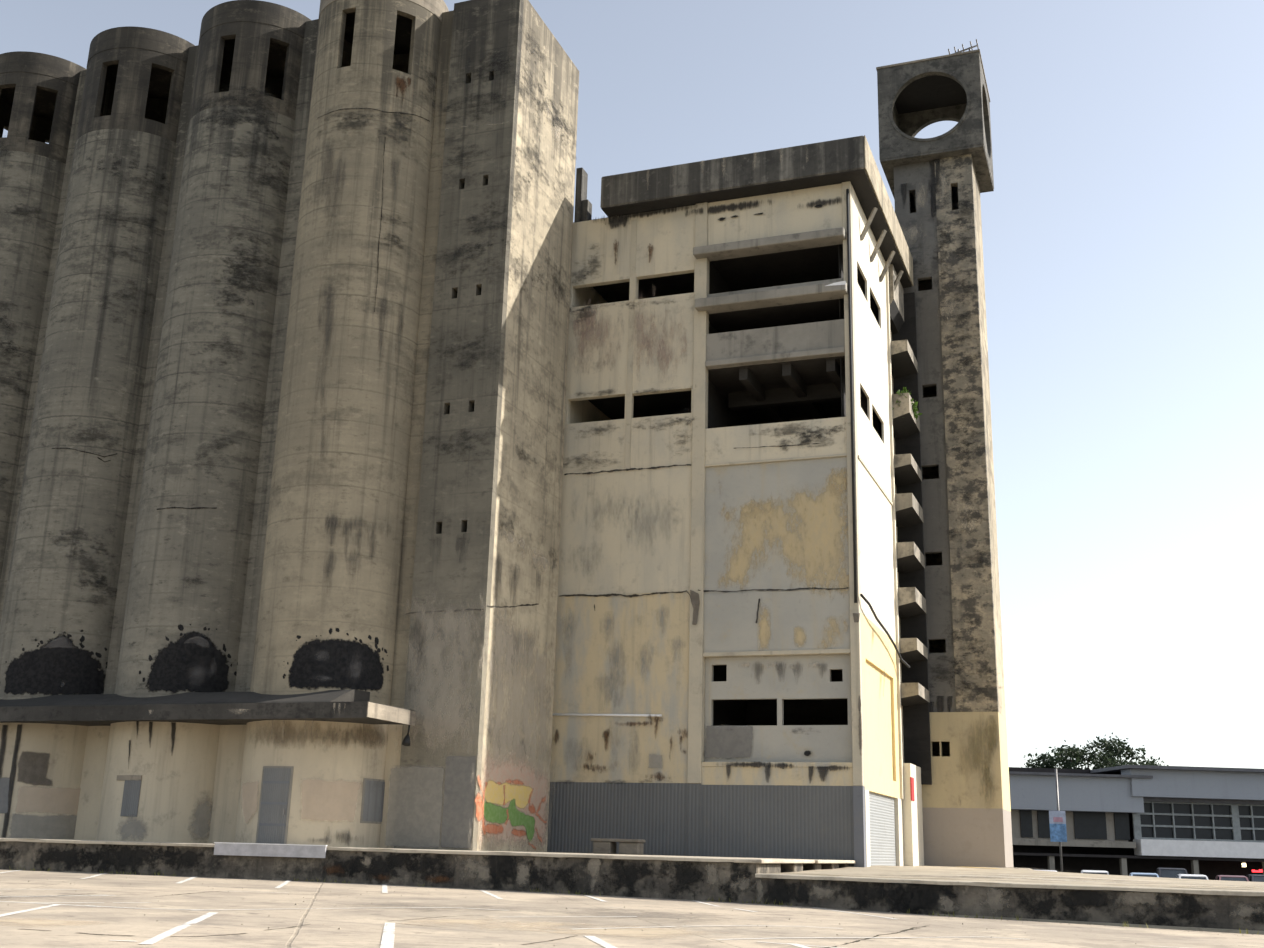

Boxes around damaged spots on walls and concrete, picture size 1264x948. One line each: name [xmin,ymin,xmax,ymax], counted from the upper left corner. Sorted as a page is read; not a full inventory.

peeling [722,472,849,591]
peeling [822,613,860,647]
water stain [0,724,22,861]
water stain [35,844,205,874]
water stain [328,852,460,884]
water stain [482,855,578,891]
water stain [598,859,703,897]
water stain [718,863,965,914]
water stain [1001,878,1109,920]
water stain [1127,884,1209,926]